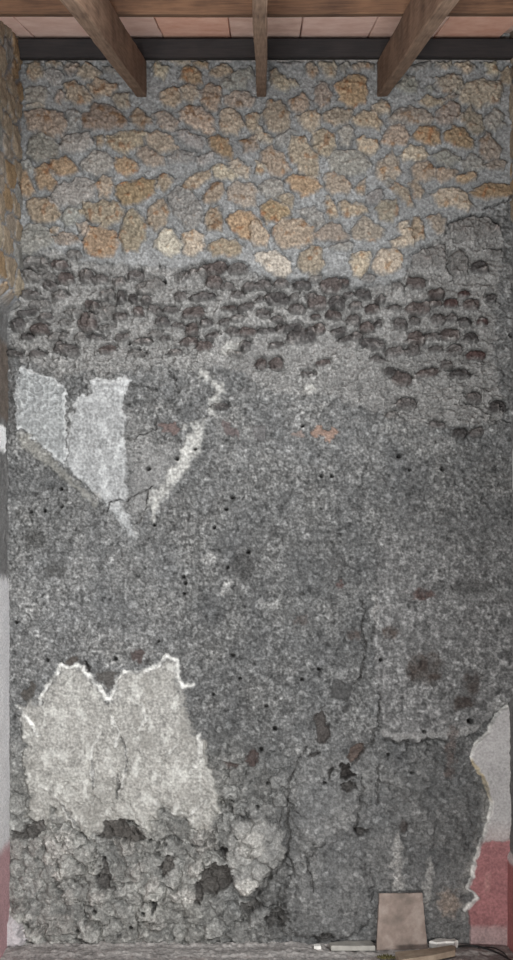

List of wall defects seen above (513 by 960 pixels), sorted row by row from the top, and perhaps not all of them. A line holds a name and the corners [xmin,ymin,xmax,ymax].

spalling [6,216,512,539]
crack [352,601,450,835]
spalling [95,856,116,892]
spalling [158,855,178,879]
spalling [192,847,234,906]
spalling [240,898,290,929]
crack [254,746,320,899]
peeling [463,704,511,947]